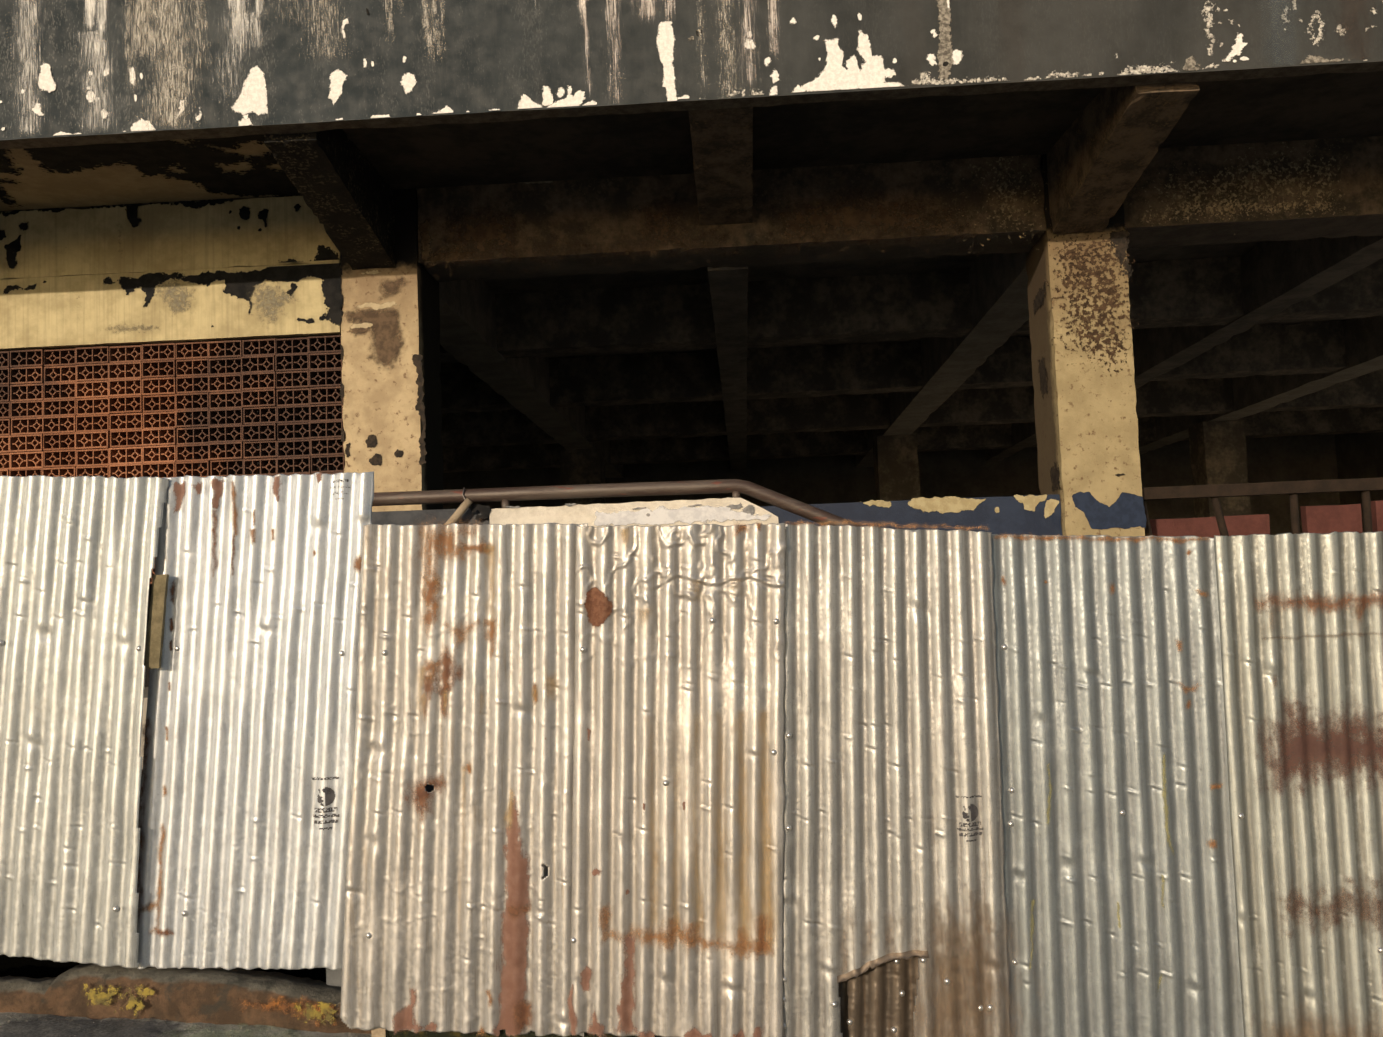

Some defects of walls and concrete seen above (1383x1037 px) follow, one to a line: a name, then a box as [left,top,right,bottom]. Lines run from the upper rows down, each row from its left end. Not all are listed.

water stain [579,0,590,91]
water stain [639,0,675,20]
peeling [656,21,703,101]
water stain [698,0,777,93]
peeling [727,0,1006,97]
peeling [0,62,302,294]
peeling [103,245,400,329]
water stain [345,277,405,368]
rust [173,478,274,569]
rust [584,587,613,627]
rust [480,798,531,1037]
rust [567,827,772,1037]